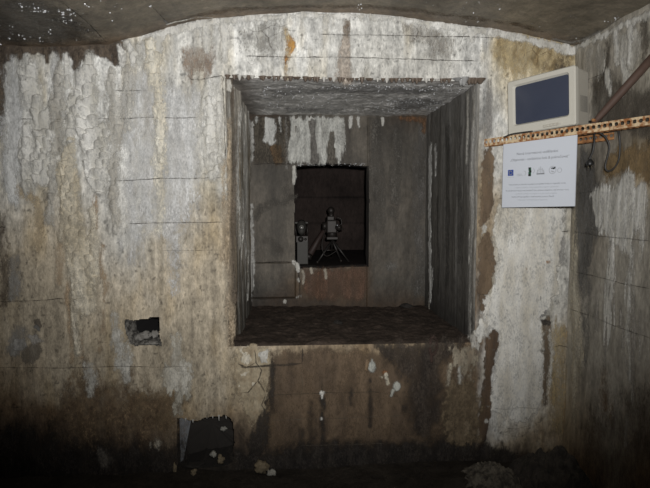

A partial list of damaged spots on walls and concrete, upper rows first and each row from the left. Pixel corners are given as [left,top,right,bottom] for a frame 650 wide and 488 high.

water stain [0,0,127,206]
water stain [0,312,194,478]
spalling [125,317,162,346]
water stain [120,69,201,296]
spalling [177,415,235,469]
crack [239,349,303,412]
rust [284,29,296,80]
water stain [145,10,650,488]
spalling [476,147,496,313]
spalling [478,329,499,448]